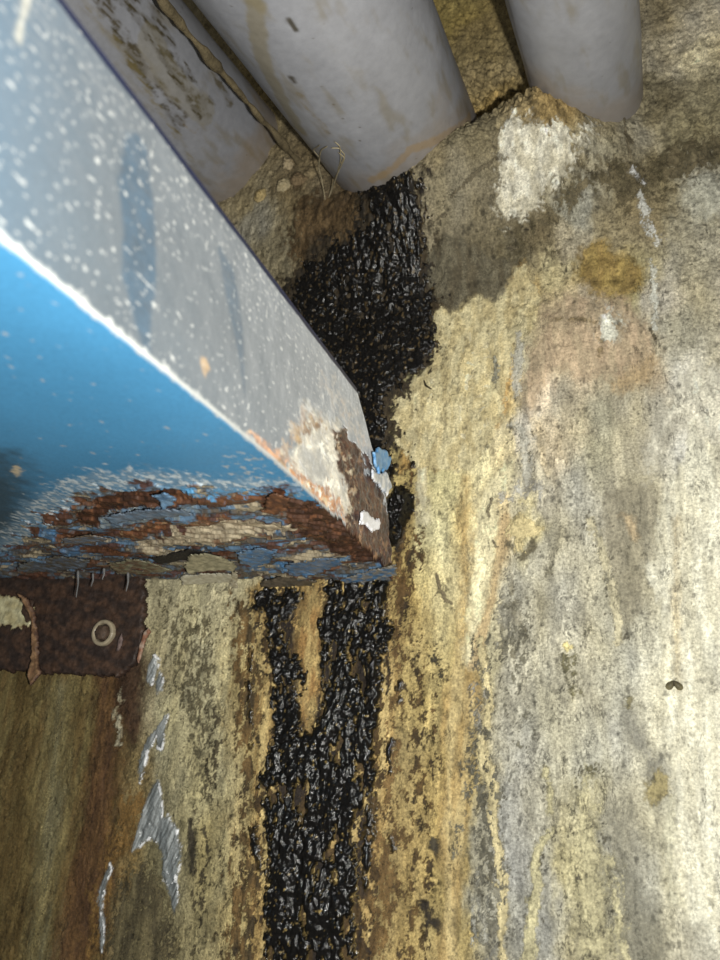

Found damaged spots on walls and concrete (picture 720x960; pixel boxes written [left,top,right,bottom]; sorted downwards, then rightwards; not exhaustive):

peeling [371,447,392,497]
peeling [102,492,193,524]
peeling [359,510,381,532]
damp [106,126,720,960]
peeling [108,548,277,588]
peeling [260,557,343,588]
peeling [340,564,397,583]
rust [0,593,151,960]